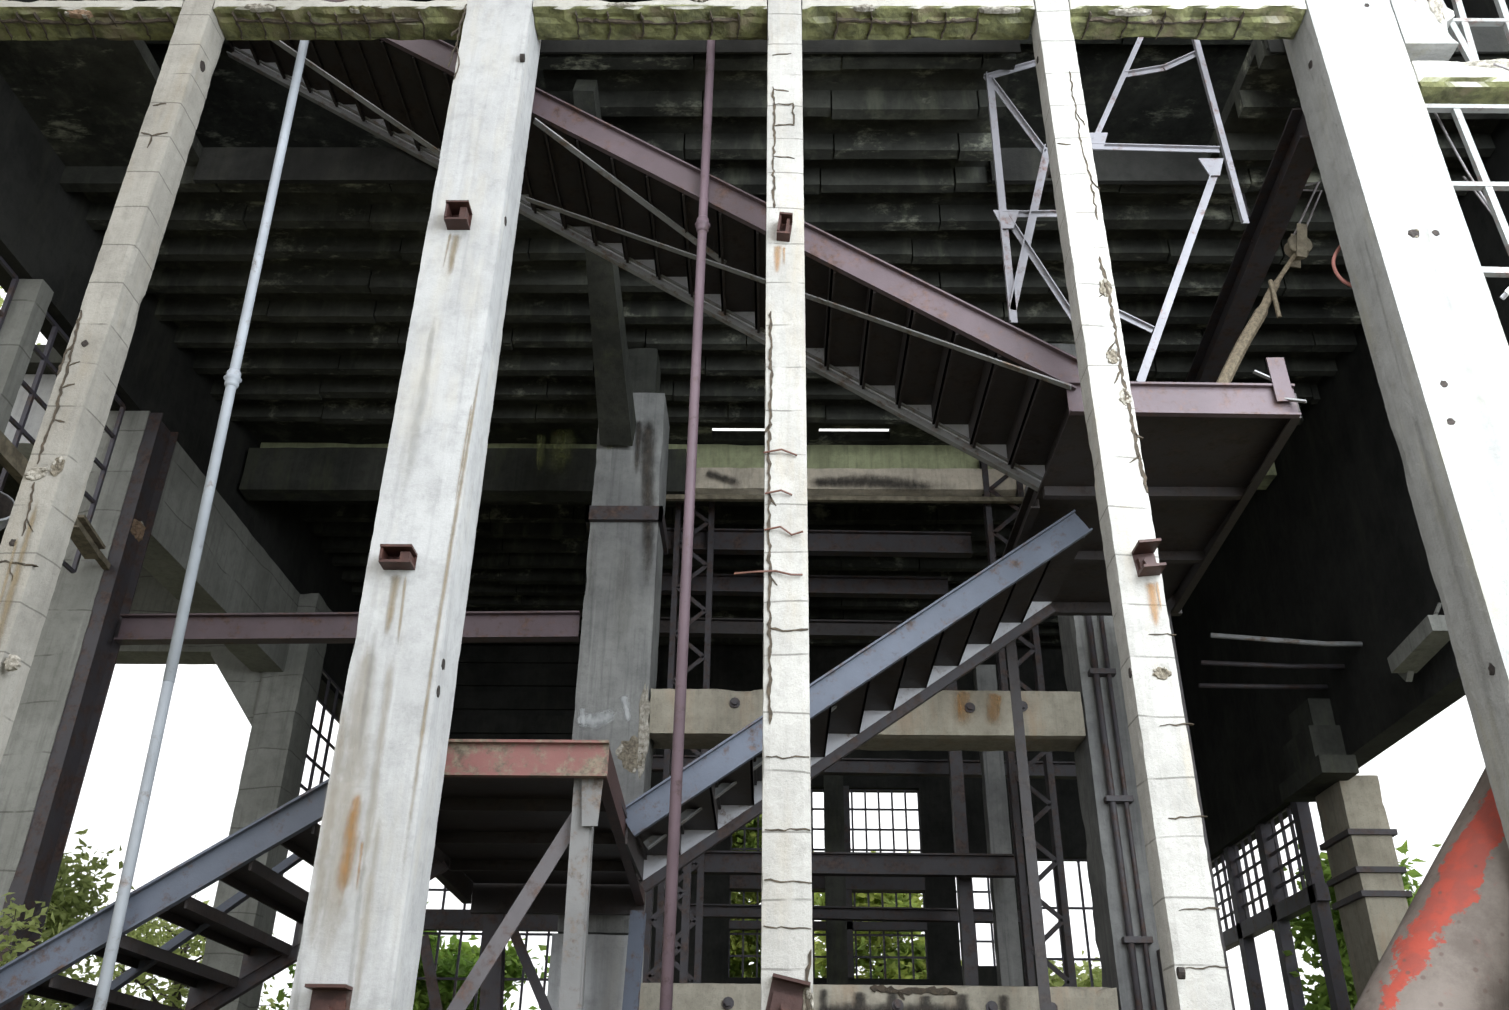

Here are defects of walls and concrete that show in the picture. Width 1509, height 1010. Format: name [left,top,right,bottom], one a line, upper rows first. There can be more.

corrosion [445,234,458,268]
crack [1099,256,1148,493]
crack [764,311,809,759]
corrosion [1149,583,1161,620]
corrosion [341,798,363,884]
crack [765,825,810,833]
crack [764,876,812,884]
crack [765,926,812,1010]